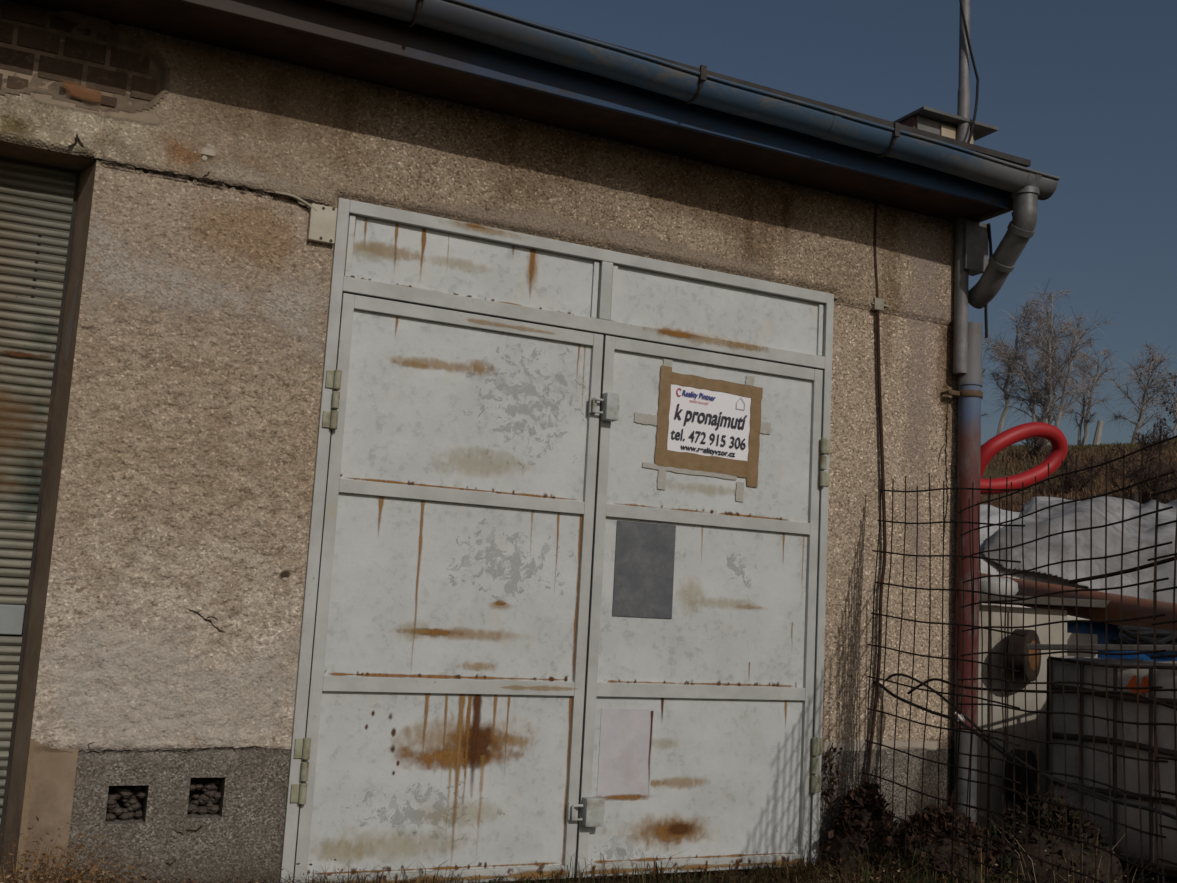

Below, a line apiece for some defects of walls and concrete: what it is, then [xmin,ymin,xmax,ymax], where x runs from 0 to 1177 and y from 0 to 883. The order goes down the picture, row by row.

spalling [0,0,171,124]
crack [68,133,335,209]
rust [659,328,693,338]
peeling [466,343,585,469]
rust [340,474,566,499]
rust [325,500,582,682]
peeling [449,521,561,599]
rust [661,505,785,557]
rust [608,662,796,723]
rust [308,693,801,883]